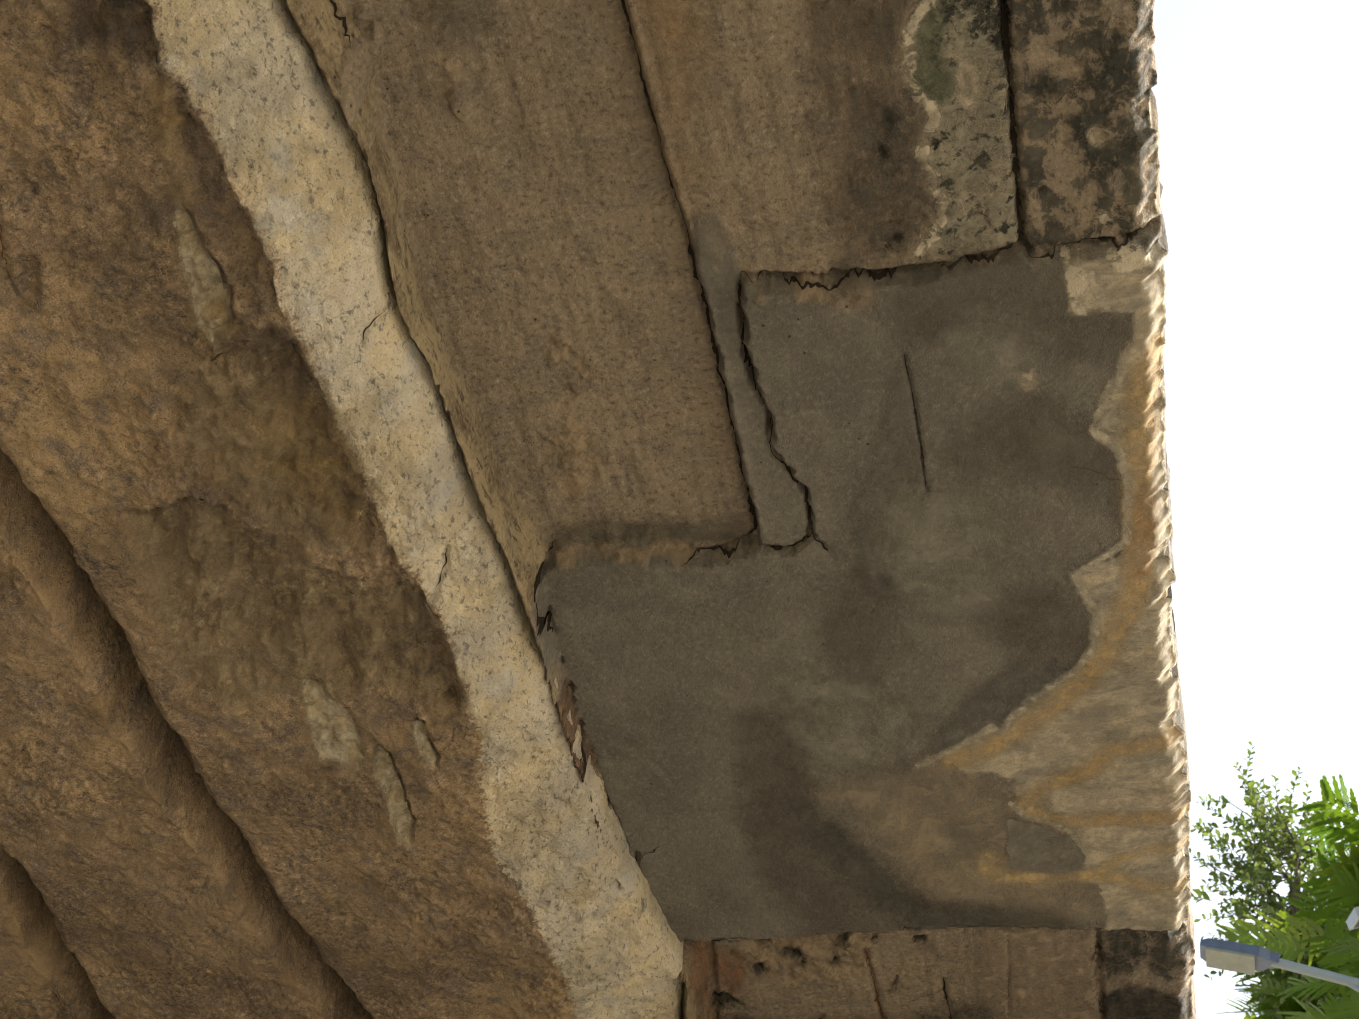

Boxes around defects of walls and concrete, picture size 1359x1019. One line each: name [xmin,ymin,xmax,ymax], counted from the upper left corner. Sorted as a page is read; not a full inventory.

crack [621,0,1151,567]
damp [809,0,1195,1019]